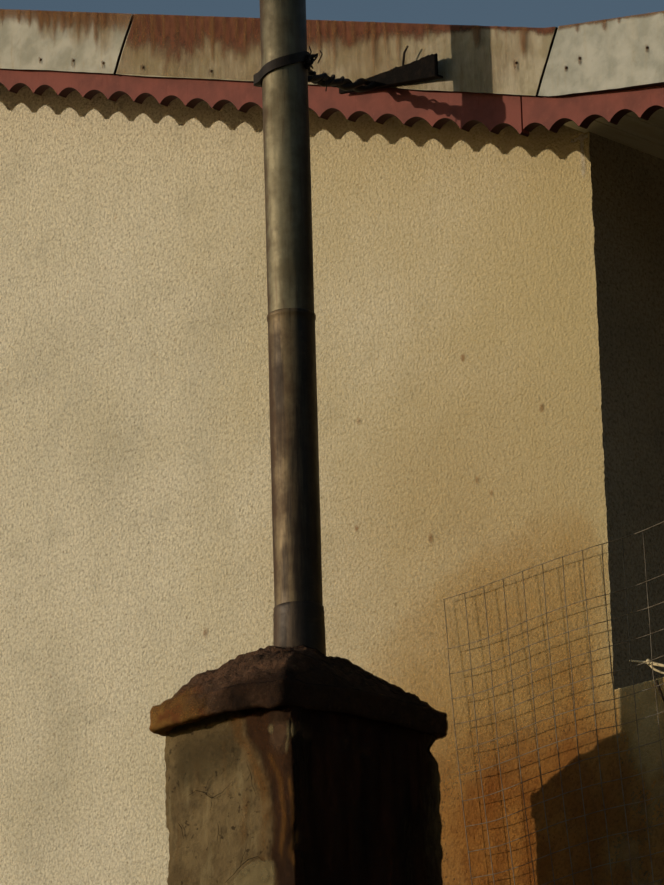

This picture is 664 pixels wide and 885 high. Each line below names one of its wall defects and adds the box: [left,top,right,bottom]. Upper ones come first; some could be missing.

corrosion [0,9,261,60]
corrosion [306,11,664,57]
corrosion [234,706,302,885]